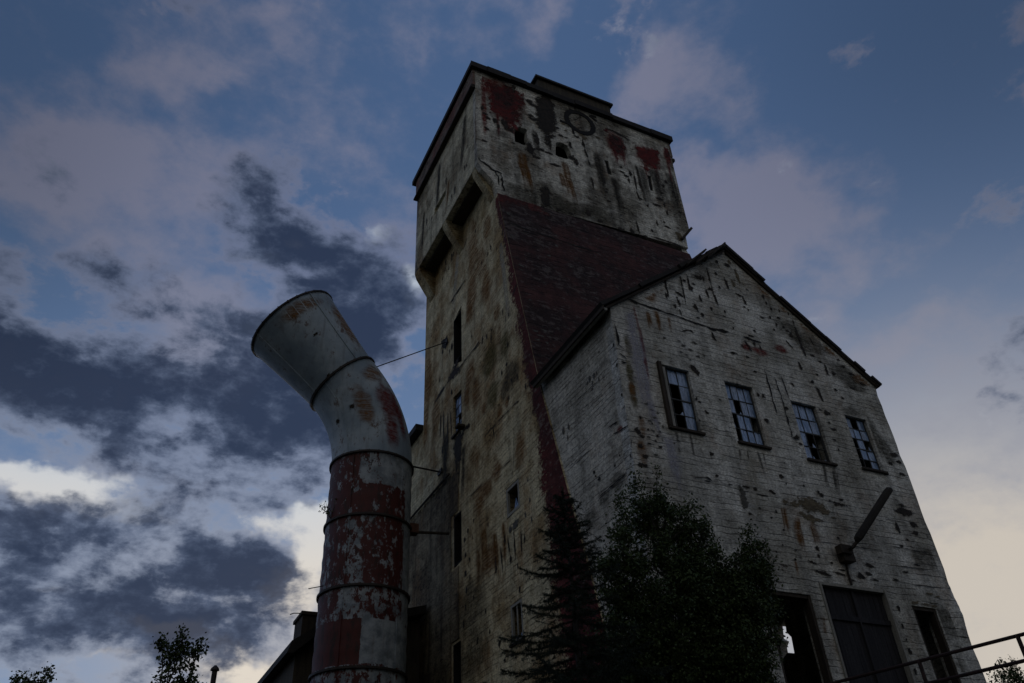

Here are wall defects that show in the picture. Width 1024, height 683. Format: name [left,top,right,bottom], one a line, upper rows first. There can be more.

flaking render [480,77,687,248]
leakage [608,133,679,202]
rust [357,367,405,443]
peeling [664,260,866,451]